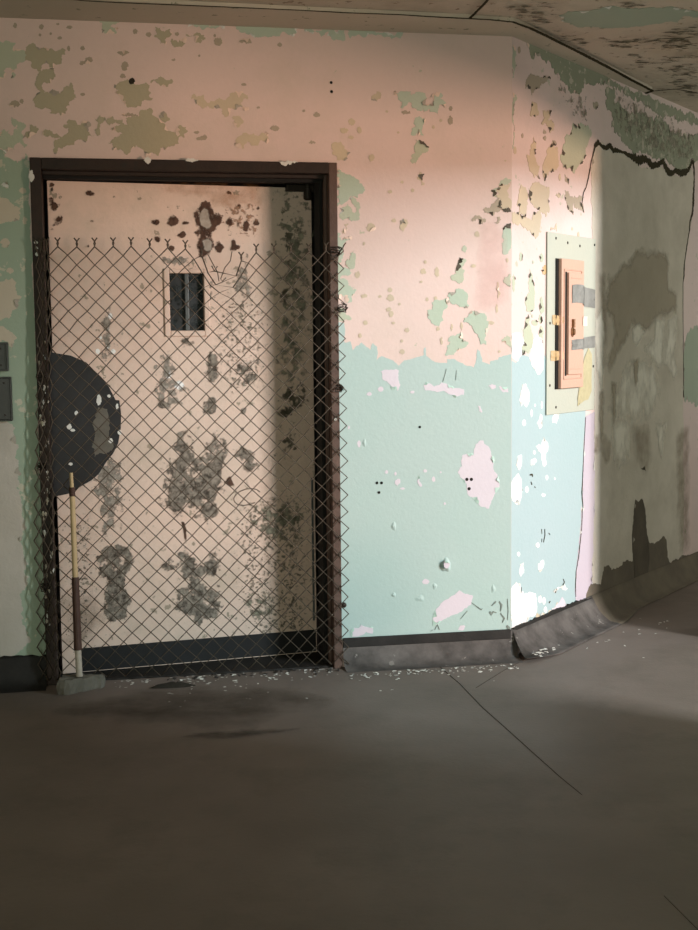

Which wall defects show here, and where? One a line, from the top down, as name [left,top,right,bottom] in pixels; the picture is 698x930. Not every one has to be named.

peeling [0,23,207,224]
crack [582,140,695,282]
peeling [425,245,516,356]
flaking render [472,42,698,628]
water stain [595,251,677,467]
crack [679,336,687,398]
water stain [250,498,310,556]
peeling [458,440,500,509]
mould [246,598,274,620]
peeling [350,625,373,637]
peeling [433,590,473,626]
crack [440,659,582,795]